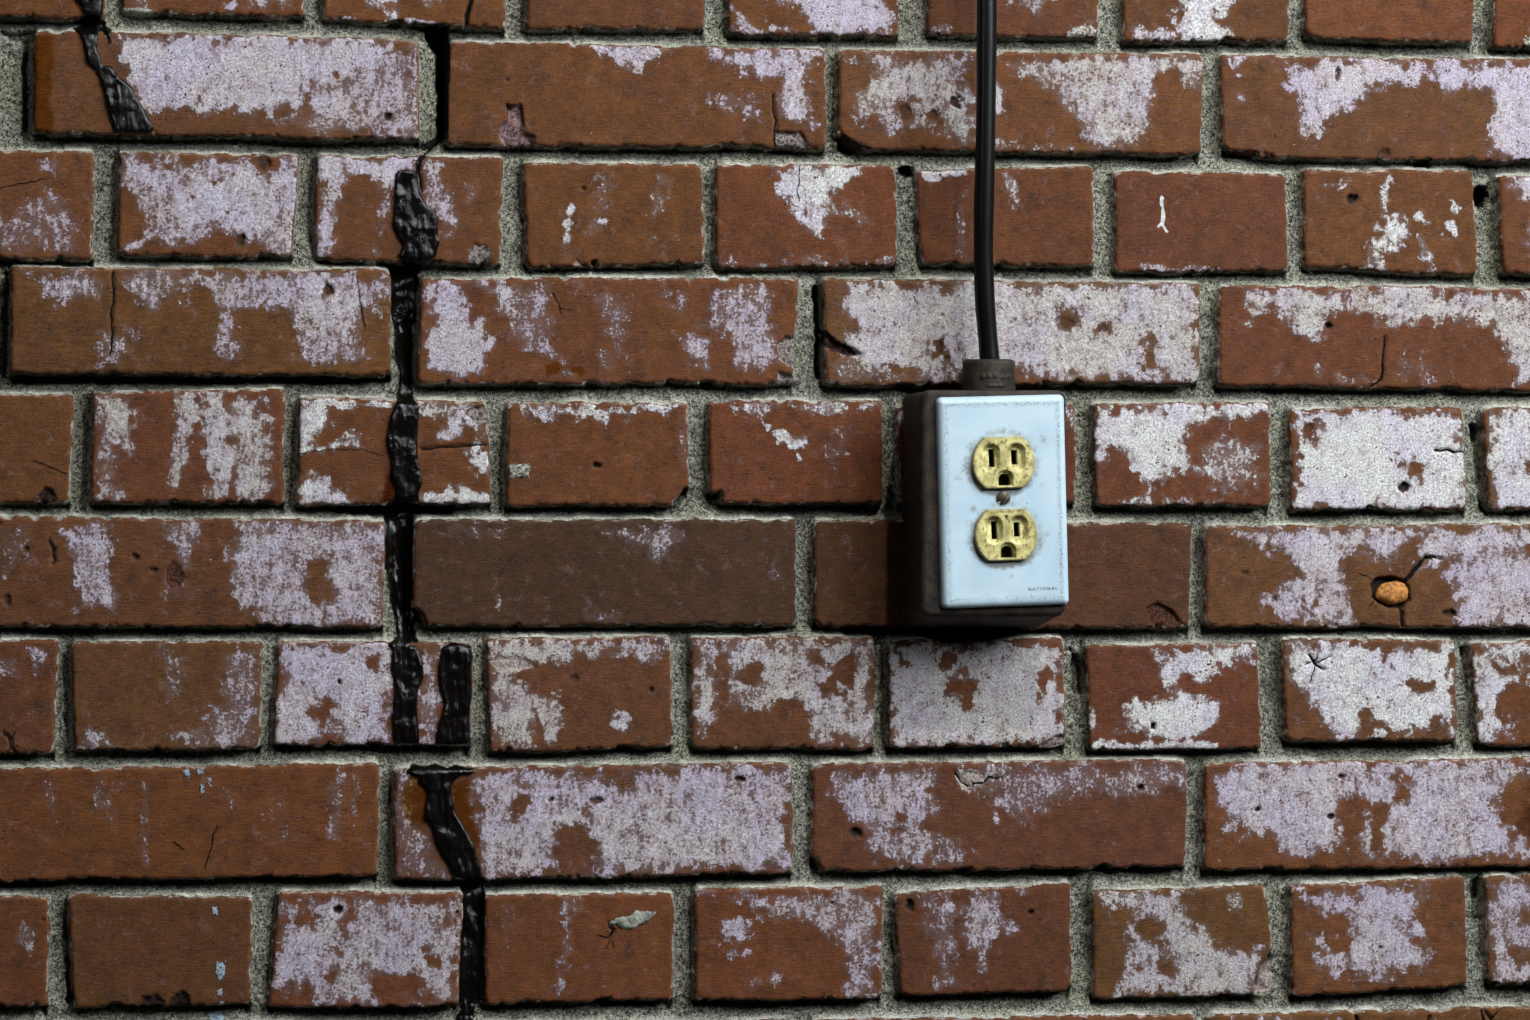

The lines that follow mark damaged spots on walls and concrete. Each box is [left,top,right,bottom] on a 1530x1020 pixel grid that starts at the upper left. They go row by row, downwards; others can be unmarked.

water stain [73,0,418,139]
crack [416,0,473,189]
spalling [498,102,536,151]
crack [108,272,116,355]
crack [357,278,366,330]
water stain [665,165,979,385]
water stain [994,263,1220,384]
crack [421,443,489,451]
water stain [120,153,882,1020]
crack [1358,556,1439,626]
water stain [691,637,1256,870]
water stain [1210,408,1530,988]